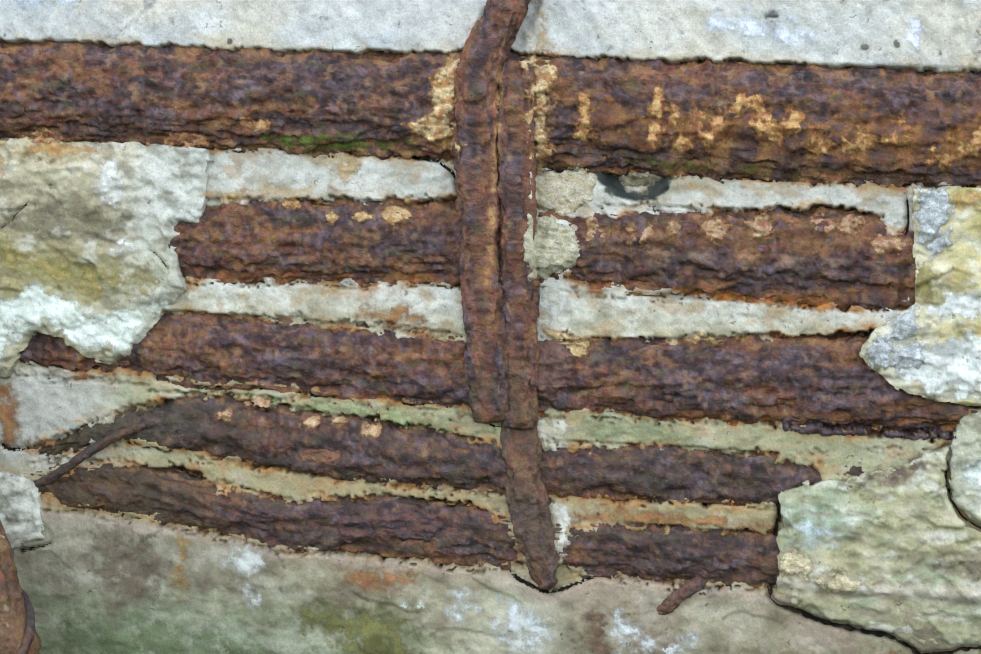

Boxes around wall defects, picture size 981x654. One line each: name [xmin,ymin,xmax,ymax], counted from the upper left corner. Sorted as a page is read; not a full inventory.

spalling [594,170,674,201]
peeling [914,187,955,261]
corrosion [355,305,426,331]
corrosion [673,288,856,312]
peeling [866,297,926,371]
corrosion [0,384,19,445]
corrosion [781,417,956,440]
peeling [778,549,874,594]
efflorescence [446,591,477,622]
efflorescence [491,602,552,654]
efflorescence [611,609,697,654]
corrosion [656,575,707,615]